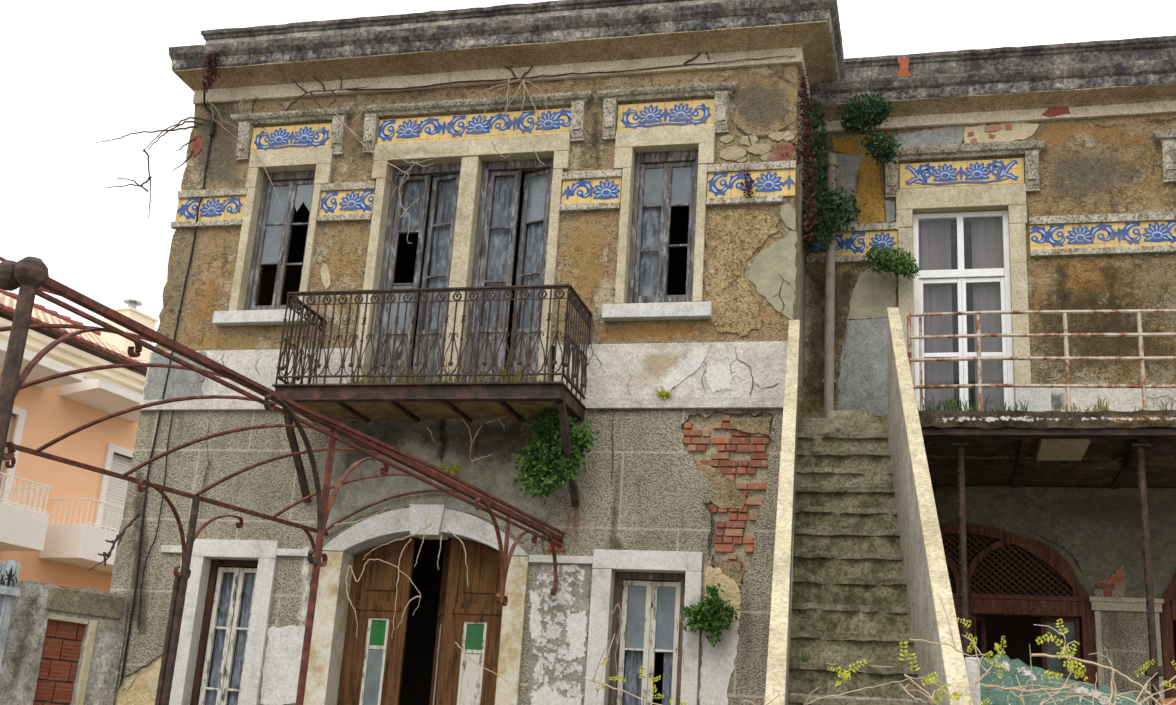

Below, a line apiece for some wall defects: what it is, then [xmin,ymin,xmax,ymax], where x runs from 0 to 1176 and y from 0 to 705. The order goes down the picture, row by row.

flaking render [716,122,797,164]
flaking render [964,106,1071,144]
leakage [1039,265,1167,368]
crack [672,344,778,396]
flaking render [682,412,774,705]
flaking render [1094,565,1125,597]
peeling [528,535,588,705]